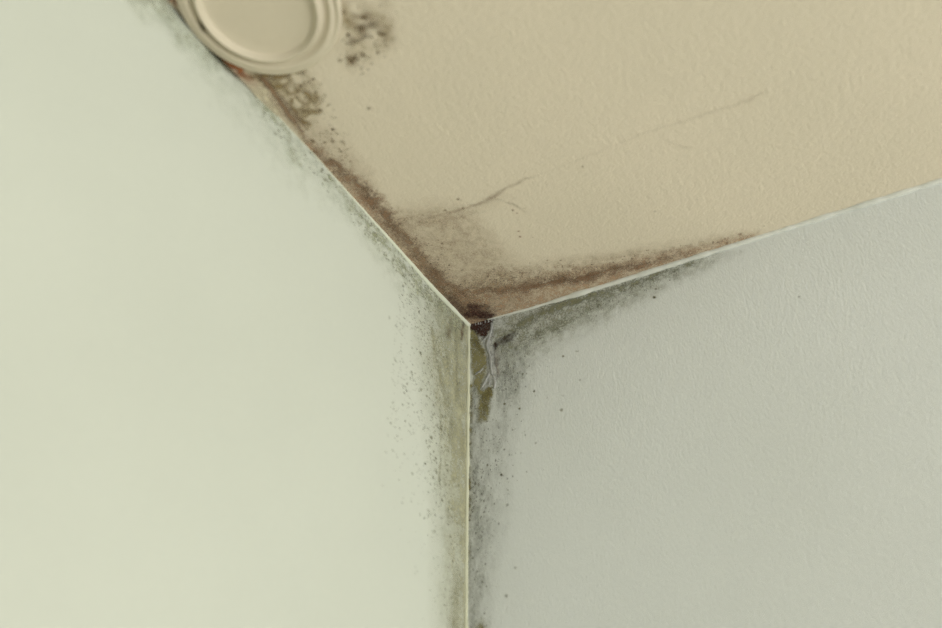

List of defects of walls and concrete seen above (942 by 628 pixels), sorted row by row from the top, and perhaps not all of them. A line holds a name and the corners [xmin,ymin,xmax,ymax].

leakage [205,46,320,124]
peeling [475,319,497,390]
leakage [305,129,751,626]